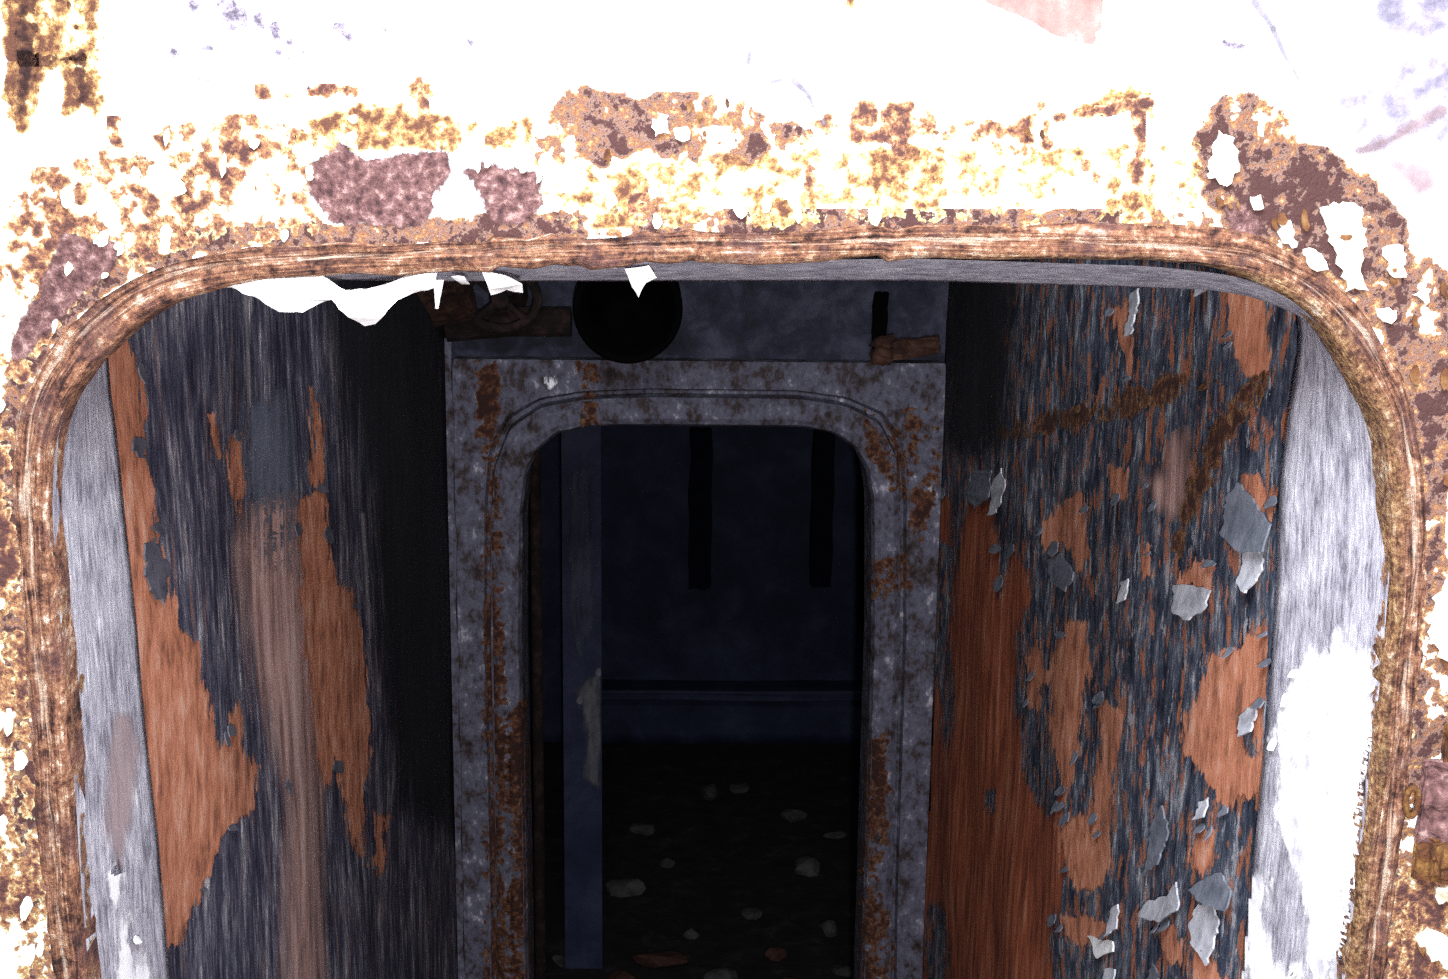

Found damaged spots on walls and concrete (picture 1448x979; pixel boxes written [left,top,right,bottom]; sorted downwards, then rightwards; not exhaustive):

leakage [1326,0,1448,197]
peeling [107,341,261,979]
corrosion [0,76,589,979]
peeling [207,386,392,979]
peeling [230,272,523,326]
peeling [612,265,656,297]
corrosion [854,732,897,979]
corrosion [528,84,1448,788]
peeling [922,468,1127,979]
peeling [1138,618,1375,979]
corrosion [1336,686,1378,979]
corrosion [1384,848,1448,979]